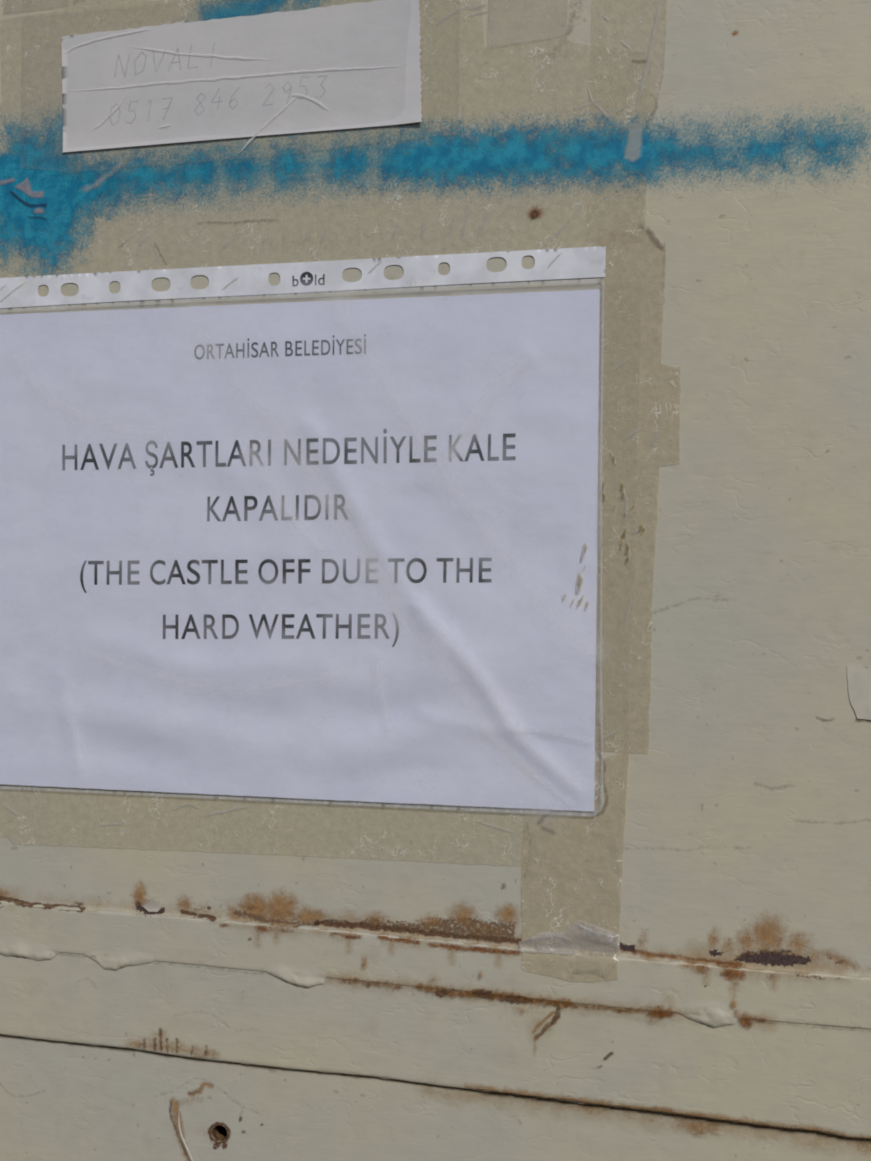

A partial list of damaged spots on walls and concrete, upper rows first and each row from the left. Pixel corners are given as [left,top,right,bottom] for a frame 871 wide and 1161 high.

rust [135,886,145,907]
rust [180,896,522,955]
rust [711,922,804,955]
rust [619,942,745,980]
rust [415,973,673,1039]
rust [731,1001,766,1026]